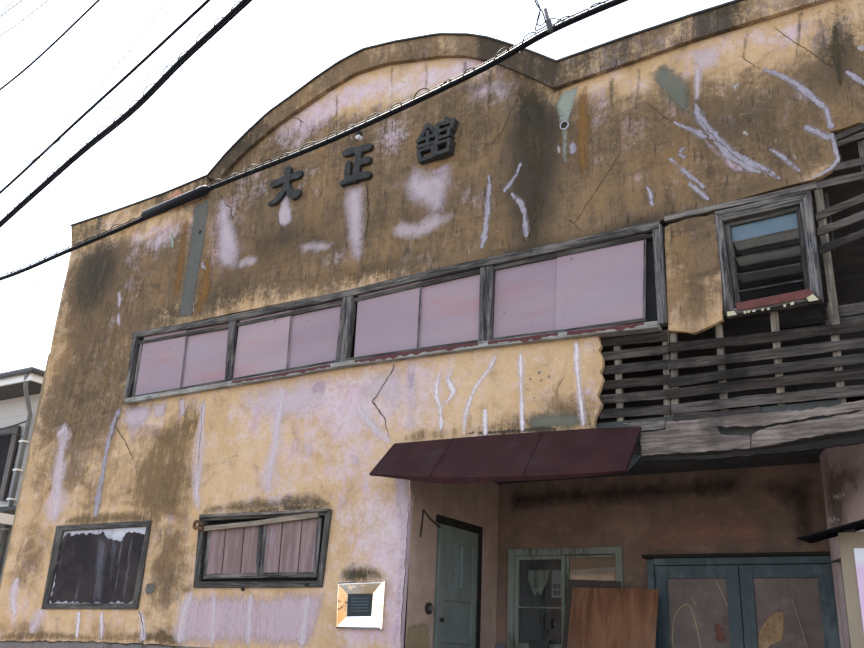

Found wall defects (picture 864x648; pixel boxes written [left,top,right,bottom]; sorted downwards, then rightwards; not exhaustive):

leakage [829,25,843,85]
peeling [345,189,362,256]
peeling [396,167,447,235]
crack [565,150,623,231]
crack [358,365,394,442]
crack [93,409,133,517]
leakage [66,409,197,525]
crack [0,579,192,648]